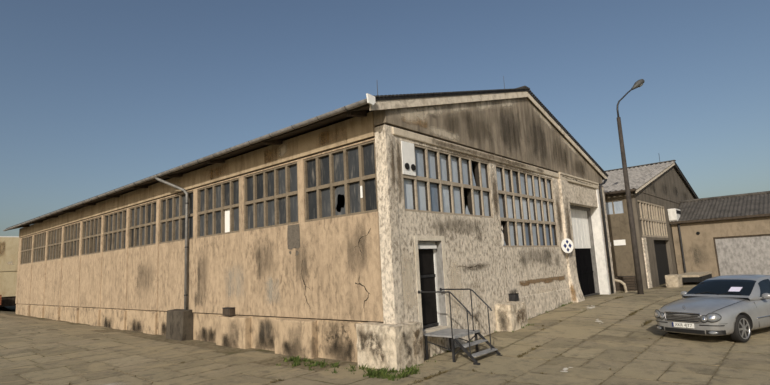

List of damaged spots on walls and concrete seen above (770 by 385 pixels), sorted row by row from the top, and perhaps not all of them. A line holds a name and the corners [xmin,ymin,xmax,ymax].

water stain [401,105,542,172]
water stain [392,149,402,194]
water stain [260,322,273,347]
water stain [329,343,351,359]